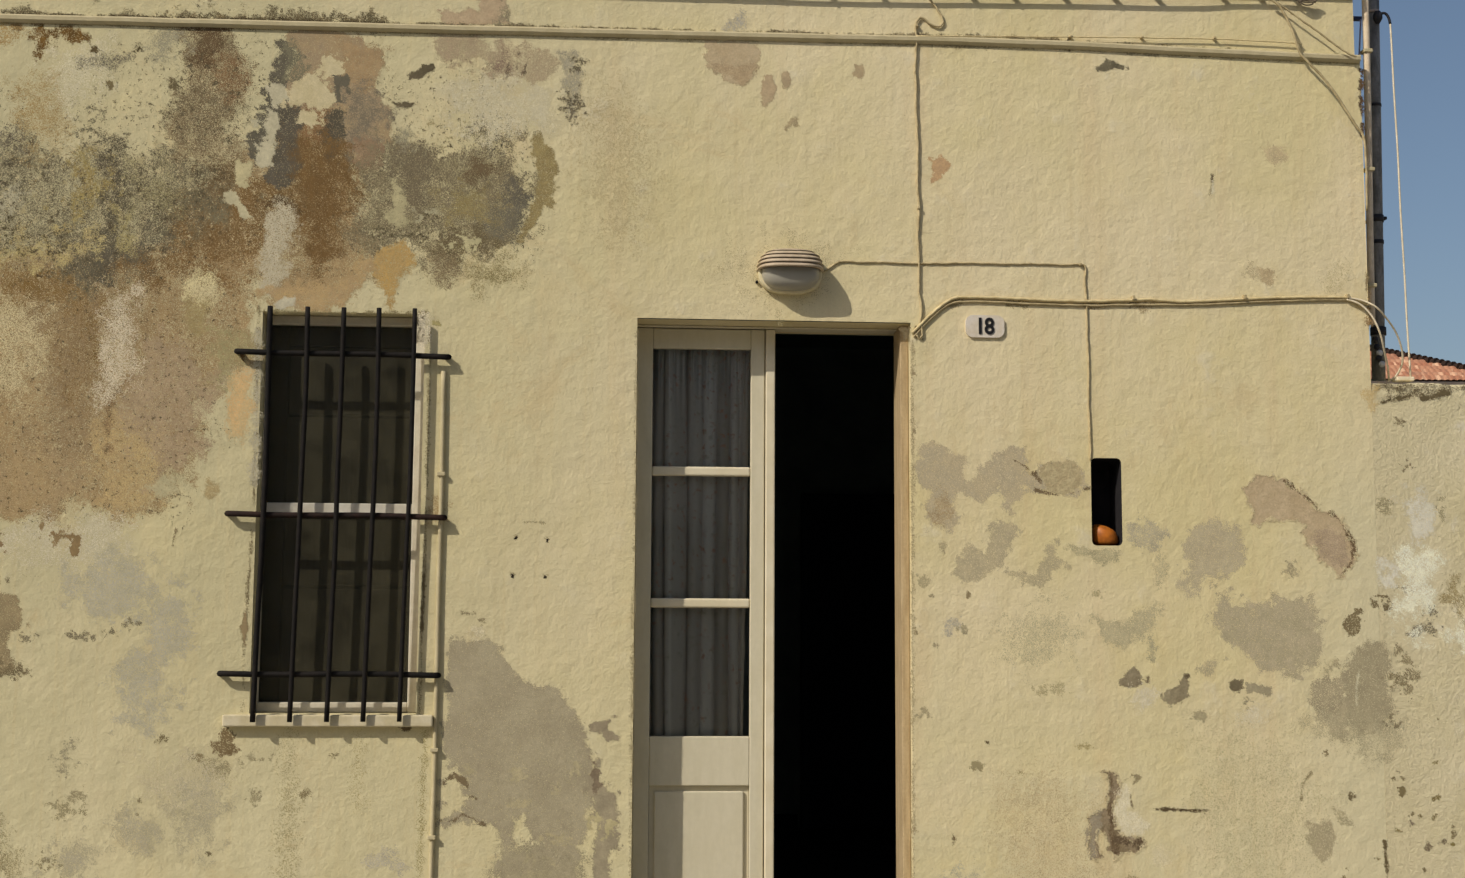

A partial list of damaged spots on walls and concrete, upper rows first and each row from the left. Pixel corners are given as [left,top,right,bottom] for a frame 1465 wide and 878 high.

peeling [703,9,791,107]
water stain [713,29,1360,66]
water stain [0,0,721,878]
flaking render [435,330,639,878]
peeling [908,340,1424,878]
water stain [1395,794,1457,873]